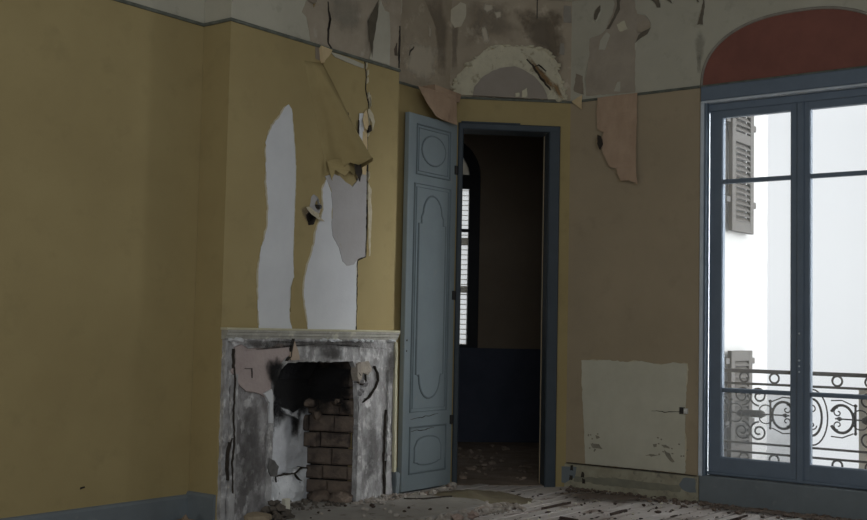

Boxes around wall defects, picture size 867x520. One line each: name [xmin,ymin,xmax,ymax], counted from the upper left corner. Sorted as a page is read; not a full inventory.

flaking render [450,44,568,102]
spalling [306,195,325,225]
flaking render [228,337,300,507]
spalling [351,361,372,502]
peeling [569,359,688,484]